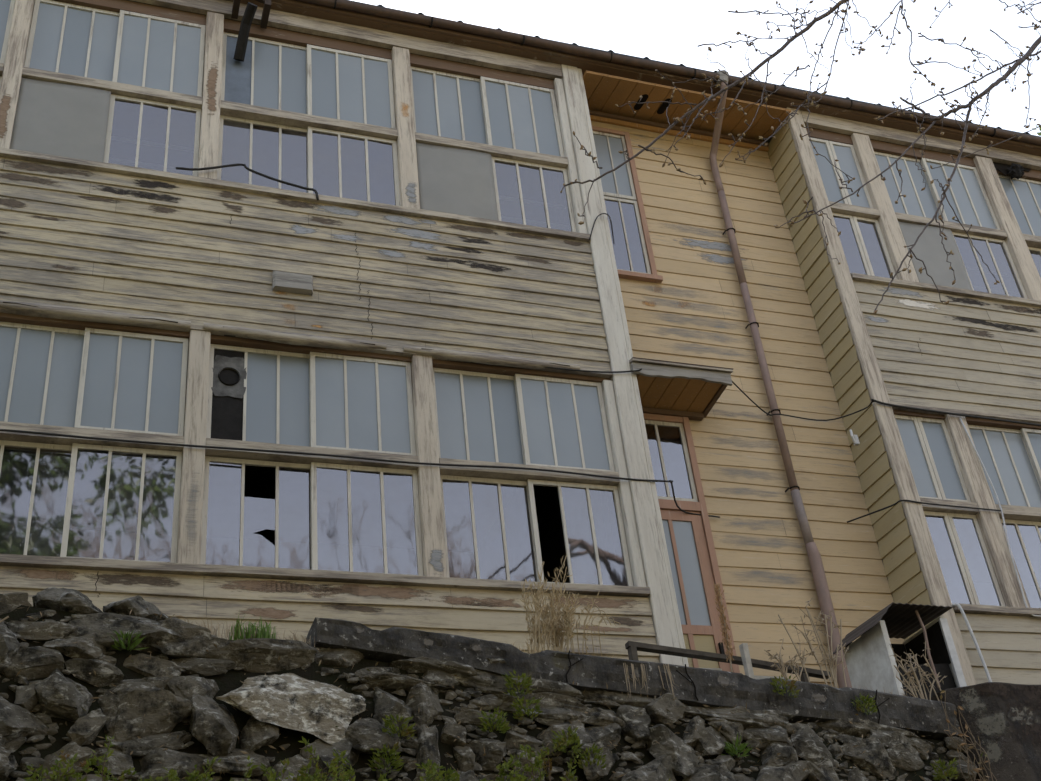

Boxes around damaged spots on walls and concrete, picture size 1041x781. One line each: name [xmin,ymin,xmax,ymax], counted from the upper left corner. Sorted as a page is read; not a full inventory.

peeling [206,63,218,114]
peeling [0,94,11,138]
peeling [0,159,181,213]
peeling [291,205,361,241]
peeling [379,215,551,272]
peeling [93,574,180,587]